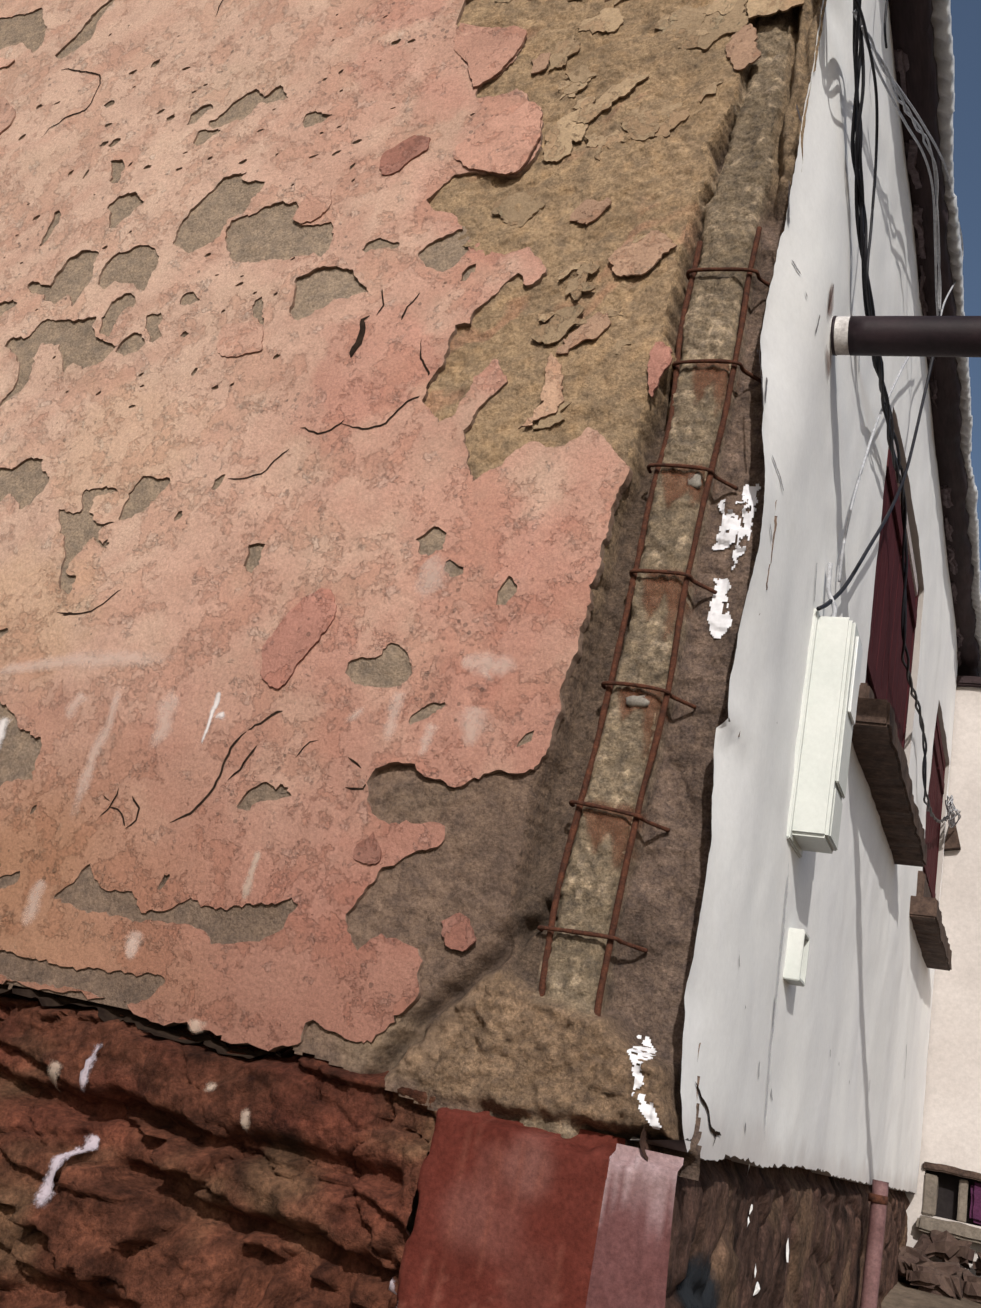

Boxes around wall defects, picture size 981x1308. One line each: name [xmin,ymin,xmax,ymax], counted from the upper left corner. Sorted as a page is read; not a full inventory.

peeling [174,160,368,320]
spalling [419,0,804,480]
peeling [0,246,163,405]
corrosion [664,467,705,503]
peeling [707,484,761,639]
crack [99,788,140,828]
crack [169,711,282,823]
corrosion [621,686,662,746]
spalling [292,764,539,1099]
crack [0,984,296,1059]
damp [37,1135,100,1205]
crack [696,1083,721,1145]